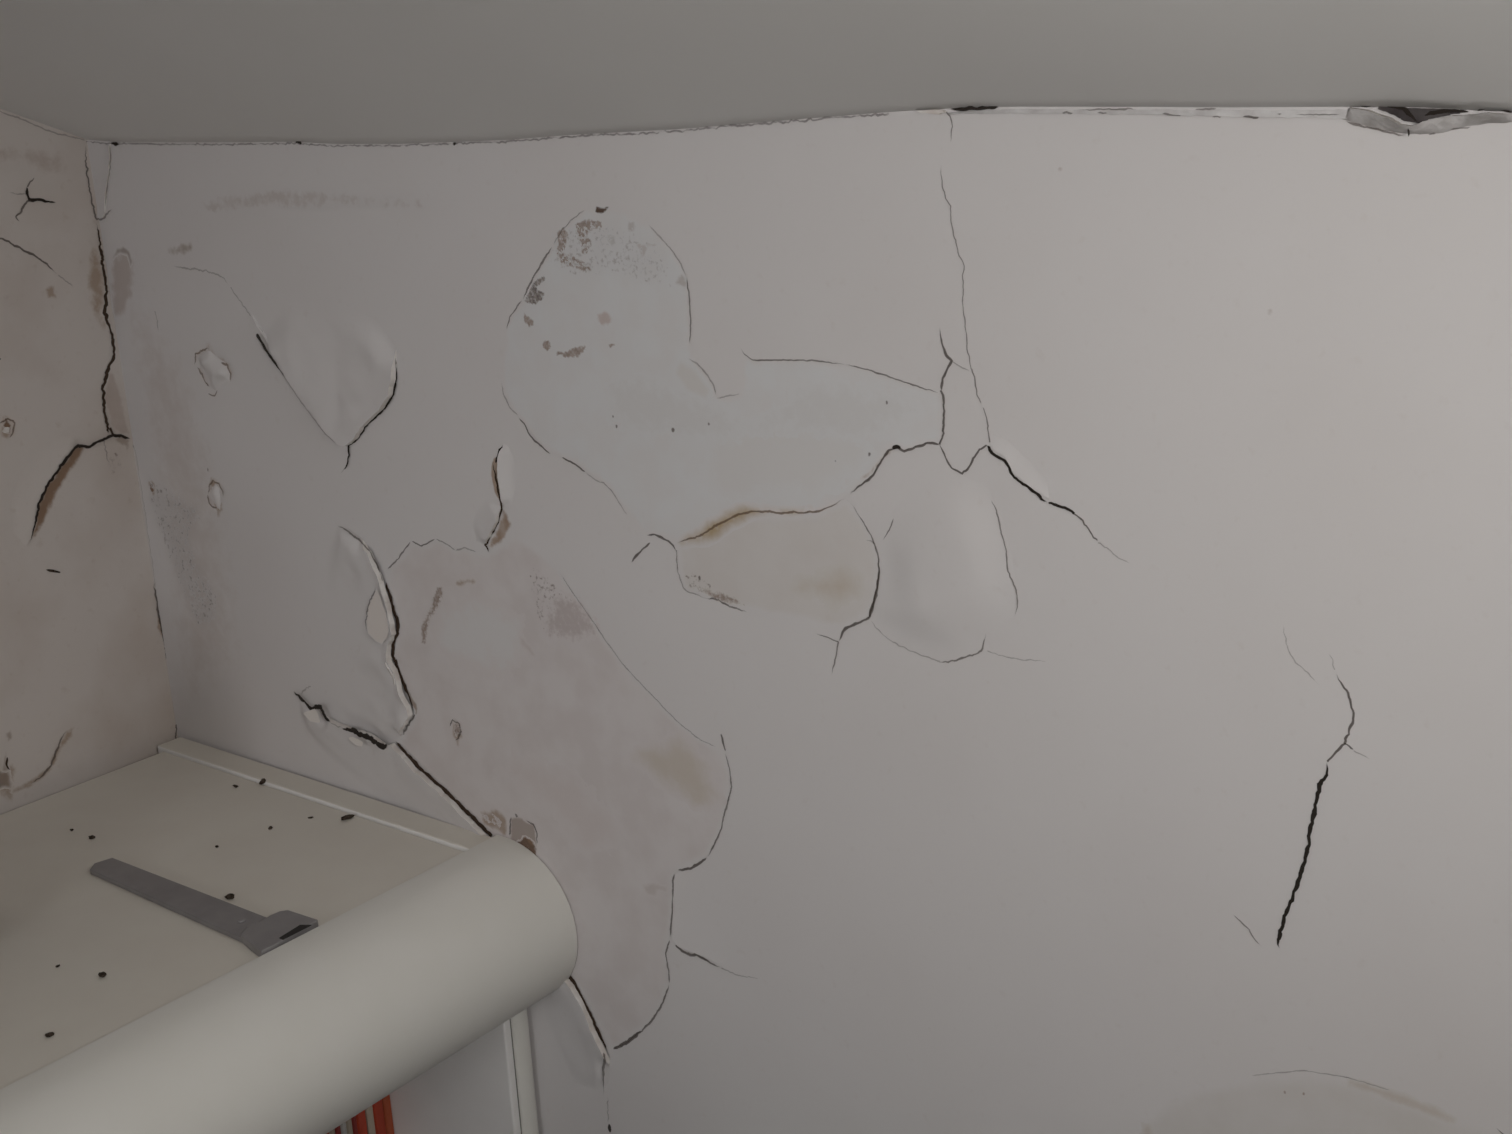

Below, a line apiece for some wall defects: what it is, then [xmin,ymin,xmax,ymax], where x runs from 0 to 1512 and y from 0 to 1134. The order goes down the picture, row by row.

peeling [1343,107,1512,136]
crack [0,142,132,453]
crack [632,176,1097,671]
crack [1236,679,1355,947]
crack [676,945,717,967]